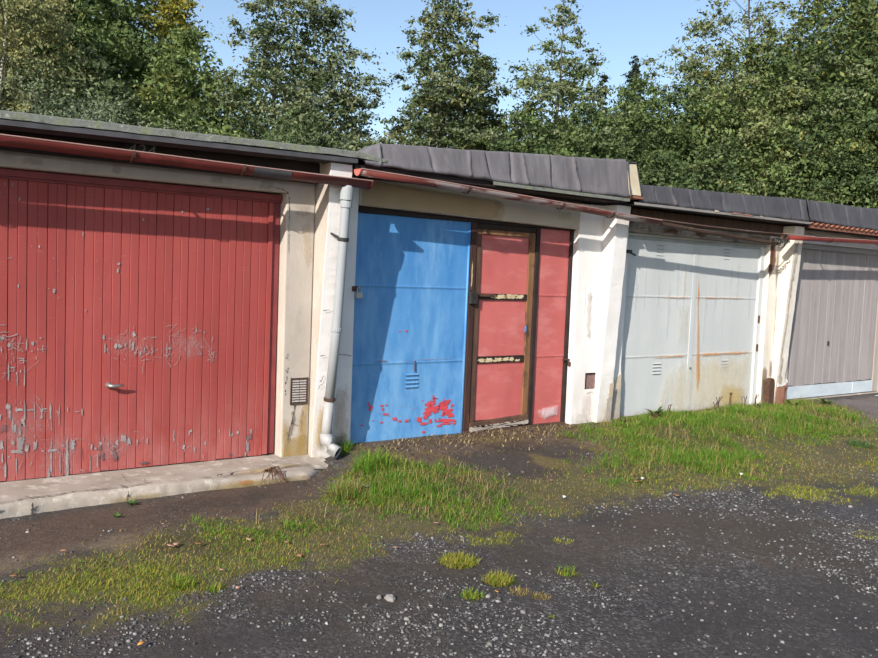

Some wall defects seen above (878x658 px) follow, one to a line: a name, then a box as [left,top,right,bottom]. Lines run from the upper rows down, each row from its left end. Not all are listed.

peeling [0,337,43,385]
peeling [102,325,152,355]
damp [670,360,748,412]
rust [696,289,747,386]
peeling [0,398,148,478]
peeling [360,395,456,433]